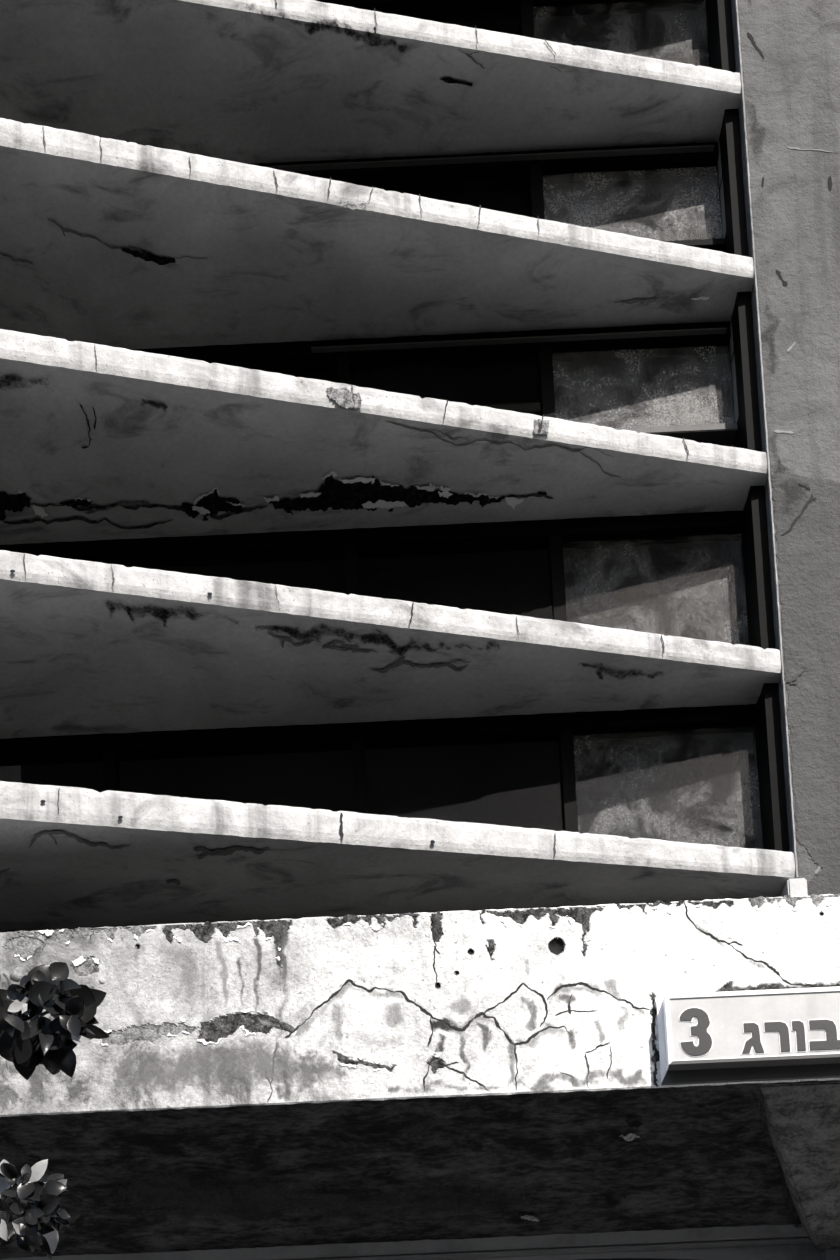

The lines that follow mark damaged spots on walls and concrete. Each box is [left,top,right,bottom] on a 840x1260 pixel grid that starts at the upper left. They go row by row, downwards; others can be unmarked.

crack [48,219,122,249]
crack [385,399,621,478]
spalling [0,490,48,521]
spalling [173,488,244,521]
spalling [264,472,524,516]
crack [268,632,471,673]
peeling [327,911,446,942]
crack [682,900,840,988]
water stain [217,926,288,1004]
spalling [102,1008,294,1045]
crack [258,911,650,1103]
spalling [427,1054,444,1074]